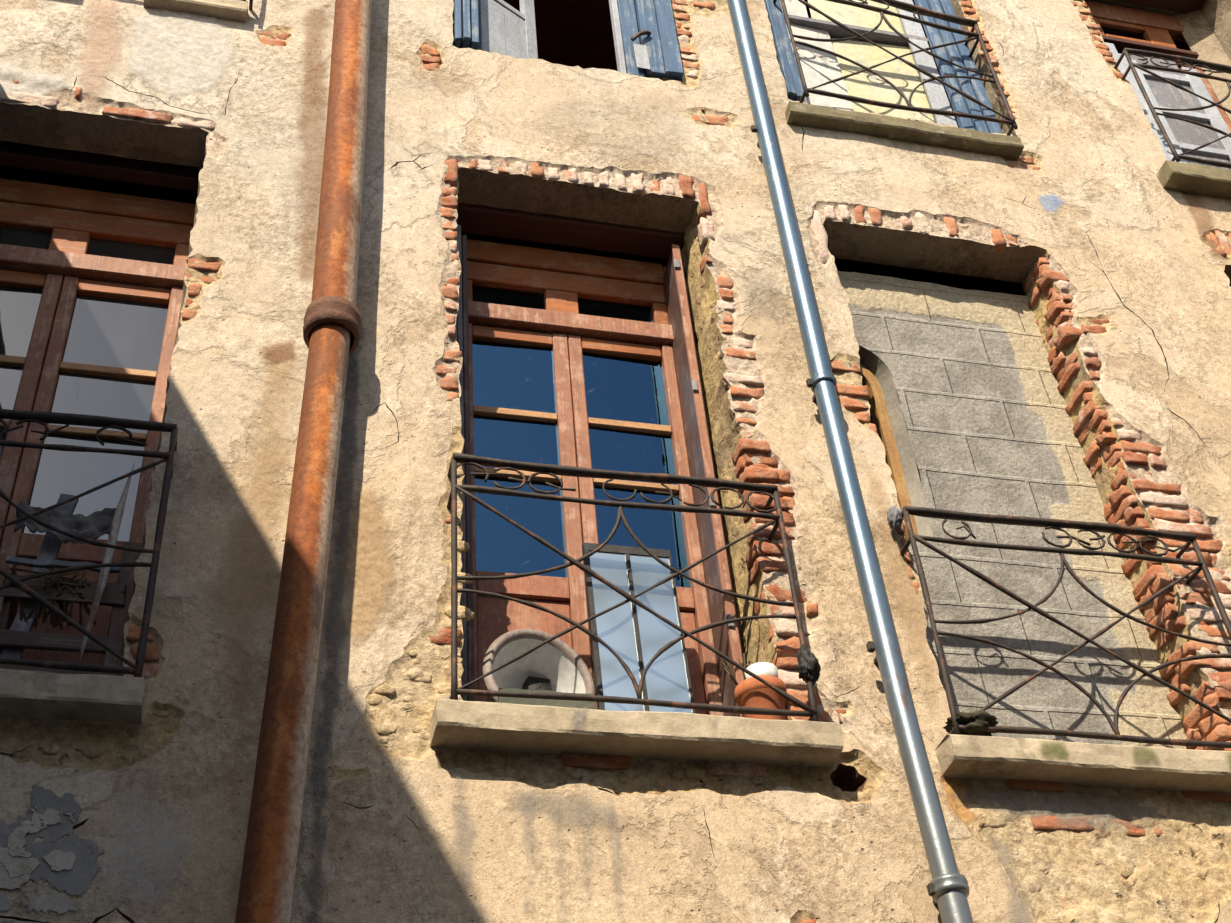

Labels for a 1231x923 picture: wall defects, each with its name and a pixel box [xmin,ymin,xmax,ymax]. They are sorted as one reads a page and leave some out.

flaking render [0,80,229,160]
flaking render [805,201,1029,271]
flaking render [1197,228,1231,261]
crack [1085,231,1208,450]
flaking render [830,352,877,433]
flaking render [432,155,856,733]
flaking render [1023,253,1231,751]
flaking render [362,424,888,804]
flaking render [0,699,185,771]
peeling [0,785,105,915]
crack [0,915,49,923]
crack [92,908,135,923]